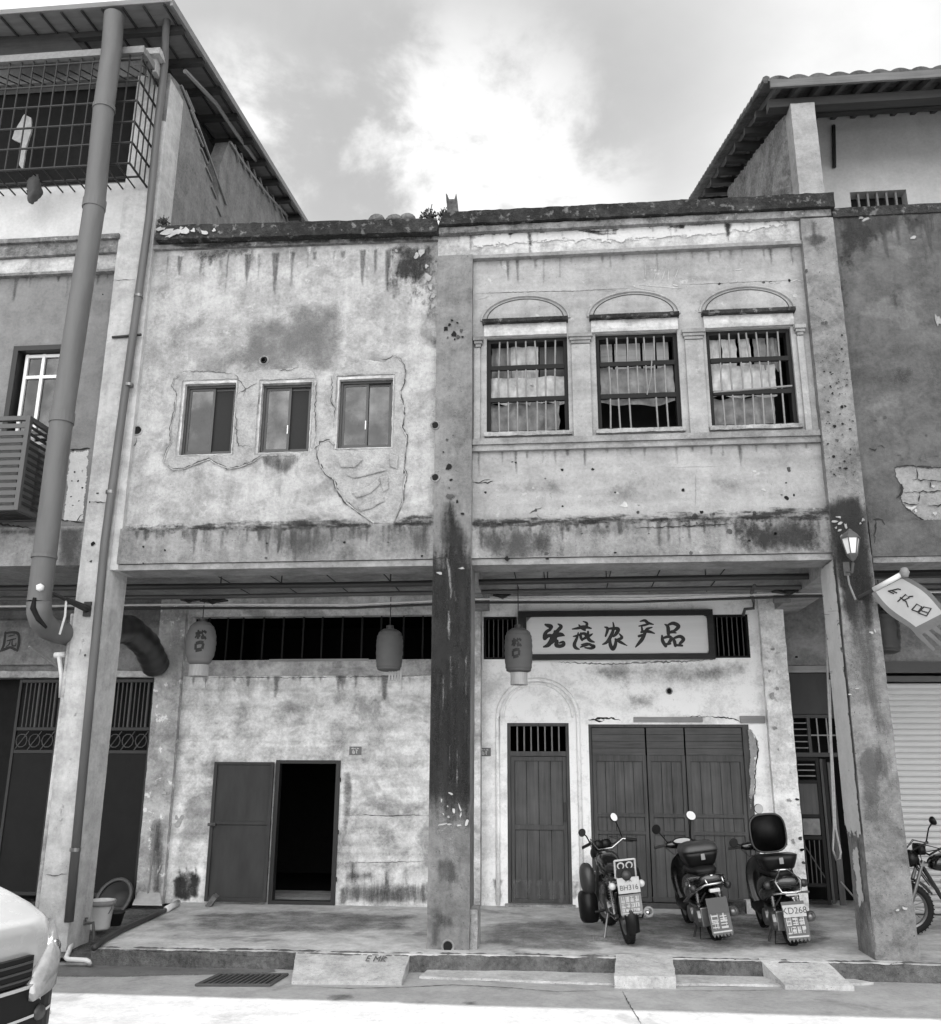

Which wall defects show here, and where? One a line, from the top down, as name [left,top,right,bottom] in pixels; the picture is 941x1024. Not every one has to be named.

water stain [174,241,250,276]
water stain [263,239,330,284]
water stain [349,236,433,294]
water stain [842,214,933,265]
crack [163,371,277,470]
crack [278,355,408,524]
flaking render [894,454,941,520]
water stain [130,519,370,552]
water stain [394,515,432,548]
water stain [429,497,879,816]
water stain [174,869,200,900]
water stain [345,872,426,901]